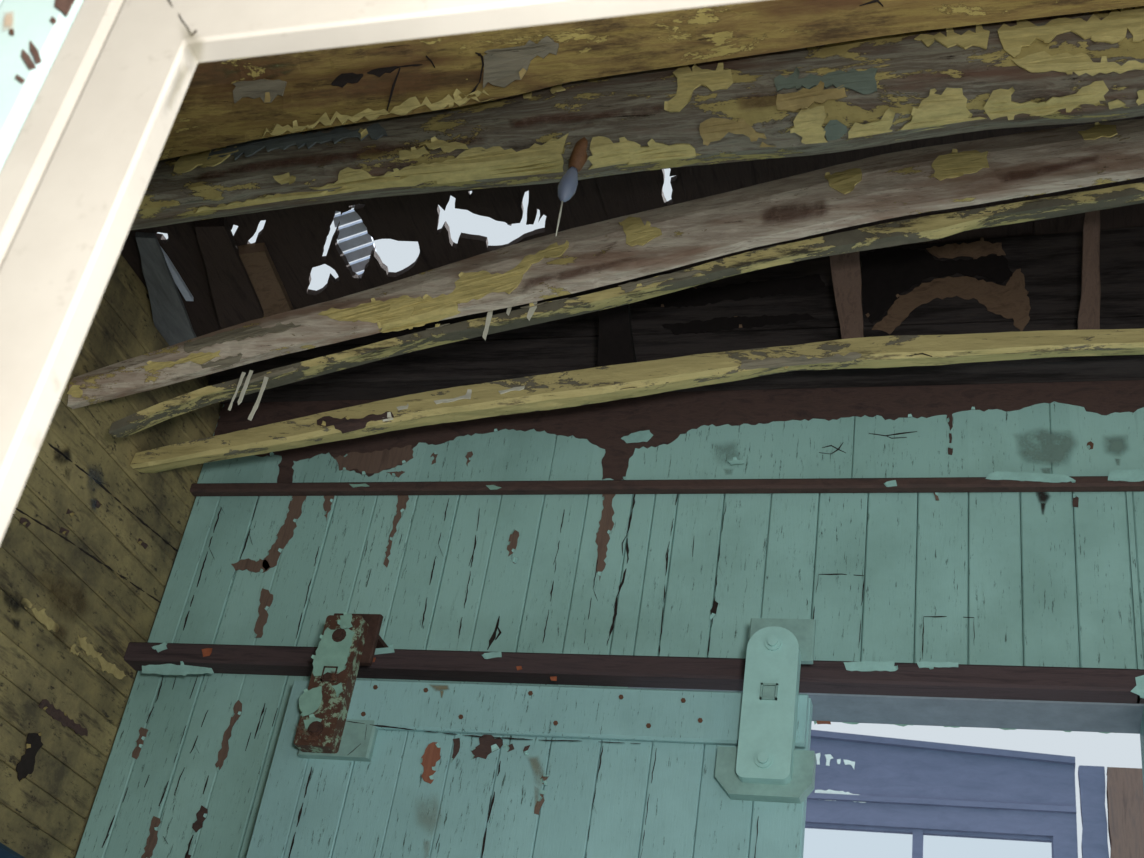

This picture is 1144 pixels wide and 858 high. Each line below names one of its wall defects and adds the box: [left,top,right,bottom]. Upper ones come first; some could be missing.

peeling [50,0,75,24]
peeling [15,40,42,84]
peeling [172,36,559,174]
peeling [664,63,733,112]
peeling [774,6,1144,144]
peeling [194,134,568,214]
peeling [587,118,776,170]
peeling [318,240,569,341]
peeling [144,322,1144,577]
peeling [254,588,273,638]
peeling [215,700,242,771]
peeling [421,734,530,784]